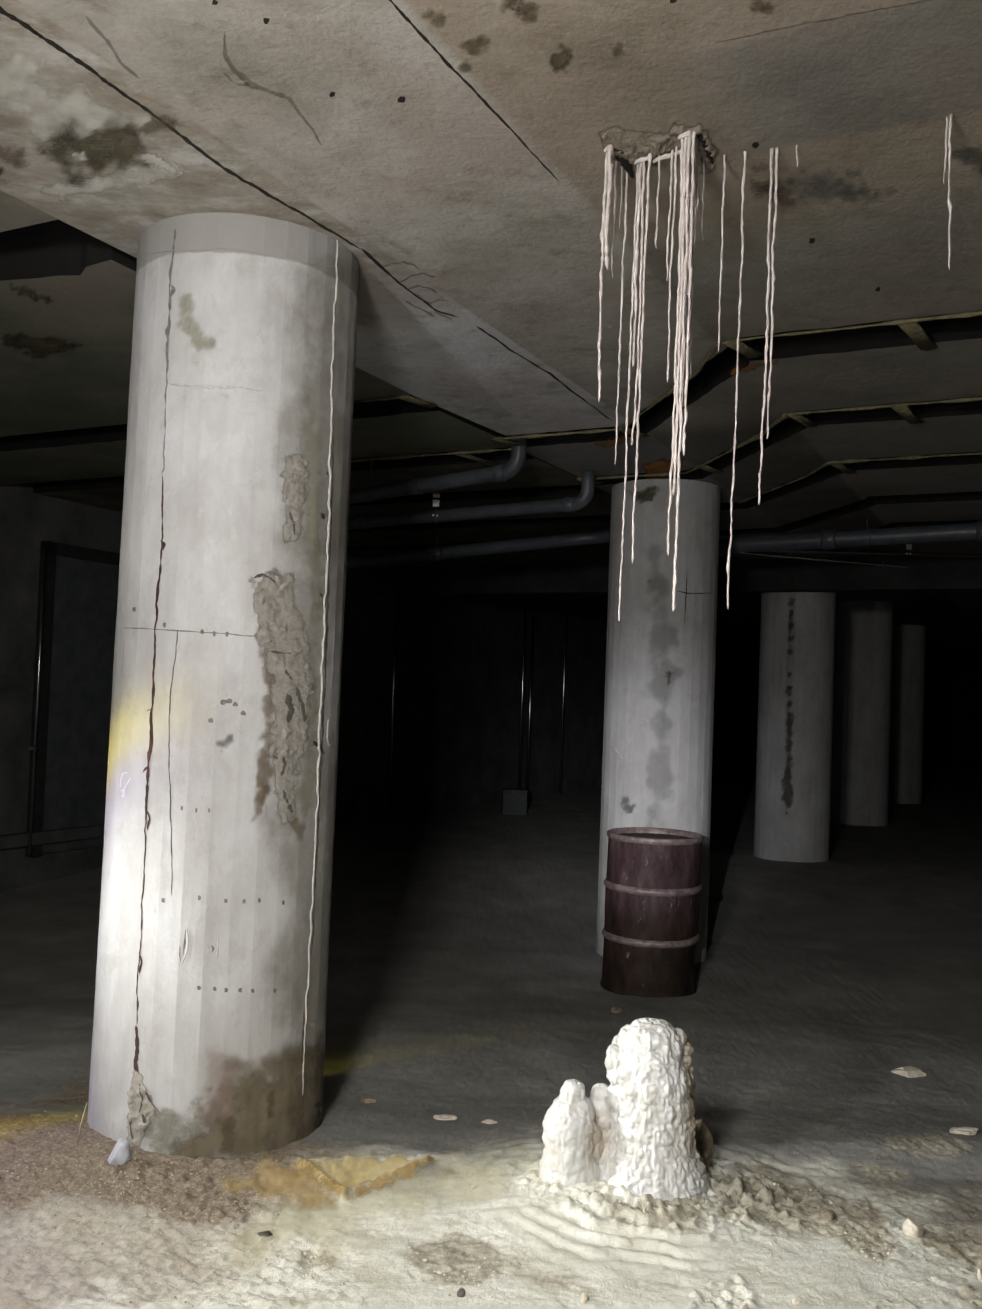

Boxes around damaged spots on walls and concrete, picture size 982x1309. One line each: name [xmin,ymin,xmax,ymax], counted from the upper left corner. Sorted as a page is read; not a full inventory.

water stain [0,51,180,200]
crack [0,0,611,420]
spalling [599,123,716,179]
spalling [281,454,310,543]
water stain [299,316,346,565]
water stain [636,486,656,502]
crack [134,229,178,1072]
water stain [255,649,275,813]
spalling [250,572,315,824]
water stain [782,673,793,814]
water stain [148,698,332,1159]
spalling [126,1071,159,1148]